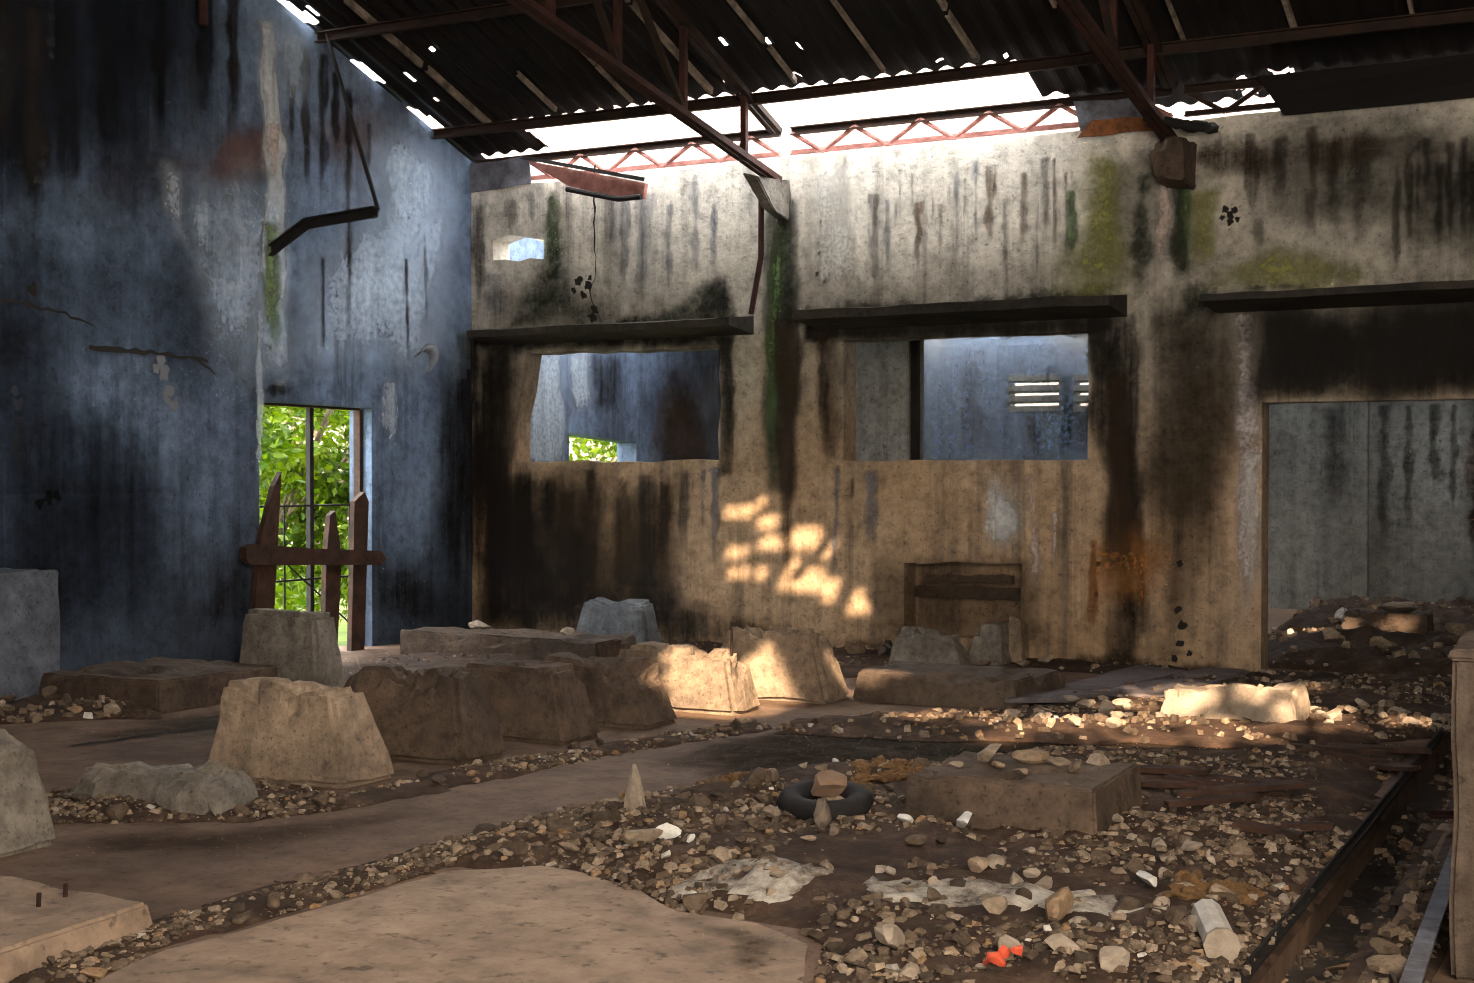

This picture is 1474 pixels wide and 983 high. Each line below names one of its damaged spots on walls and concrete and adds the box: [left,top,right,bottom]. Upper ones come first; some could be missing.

damp [191,0,240,124]
damp [197,23,429,455]
damp [820,171,852,280]
damp [869,194,889,259]
damp [900,162,996,258]
damp [1395,141,1474,244]
crack [0,298,215,374]
damp [765,228,826,555]
damp [818,365,829,421]
damp [1429,405,1457,492]